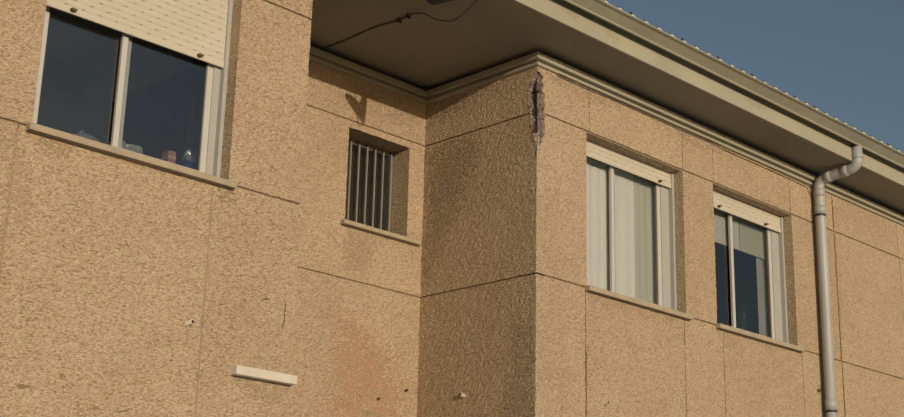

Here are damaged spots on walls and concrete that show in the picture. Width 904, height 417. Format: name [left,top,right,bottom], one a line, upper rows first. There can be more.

spalling [527,72,546,150]